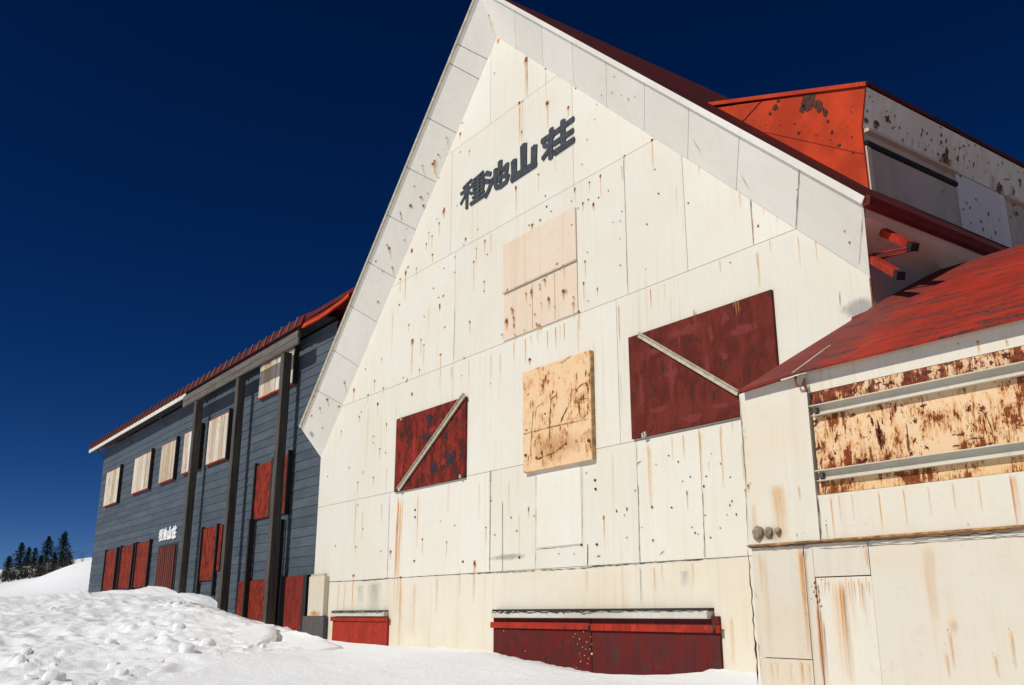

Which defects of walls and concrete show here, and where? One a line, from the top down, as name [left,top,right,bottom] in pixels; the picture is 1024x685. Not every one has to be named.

peeling [794,93,852,147]
corrosion [501,275,556,362]
corrosion [839,579,867,635]
corrosion [806,609,823,667]